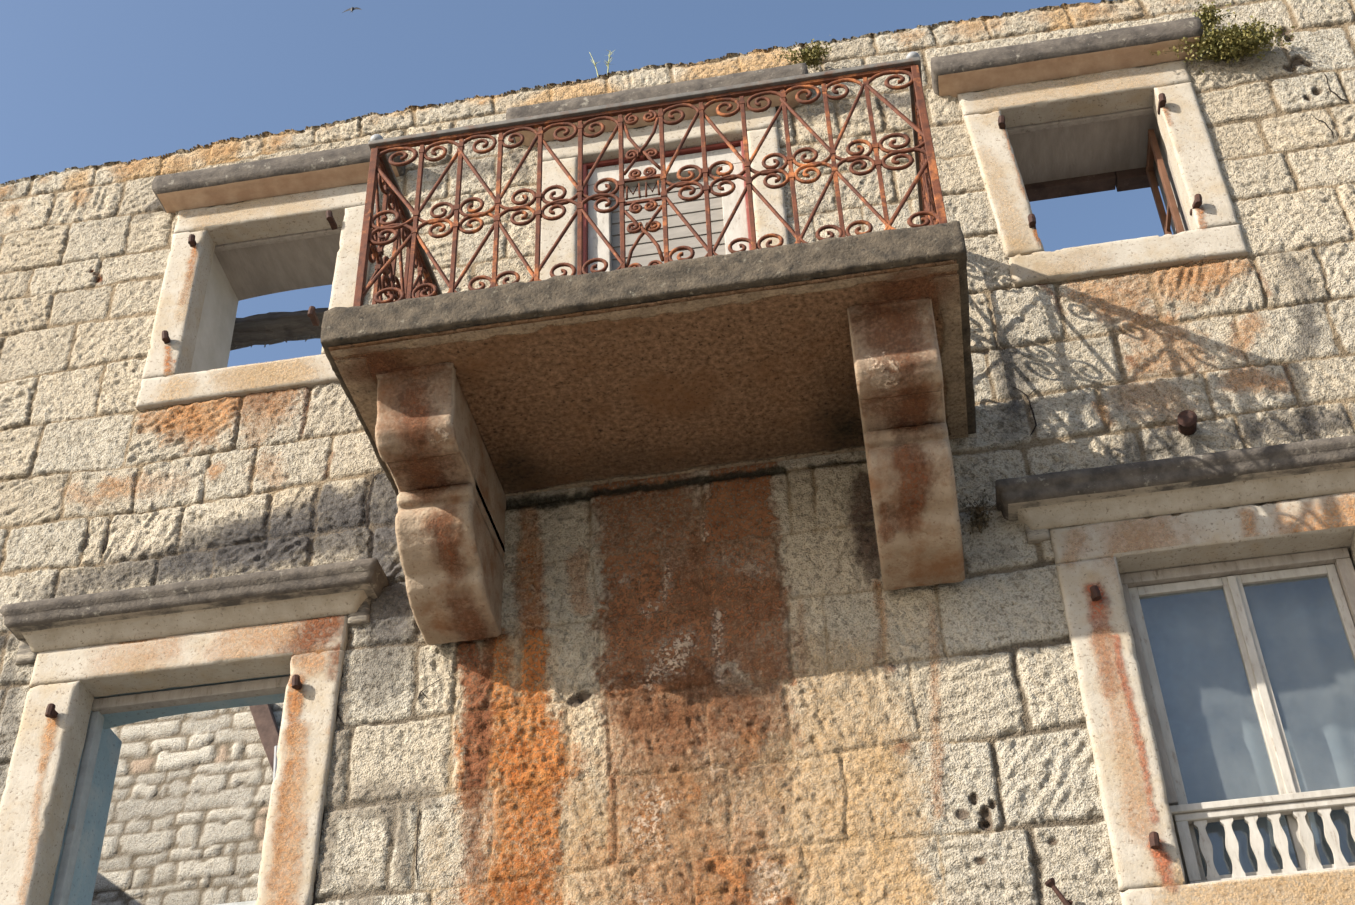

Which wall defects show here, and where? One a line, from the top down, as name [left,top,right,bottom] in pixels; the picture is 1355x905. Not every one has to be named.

rust [1282,495,1355,533]
rust [260,615,344,905]
rust [454,517,577,905]
rust [707,852,746,898]
rust [1086,584,1157,820]
rust [1148,839,1176,890]